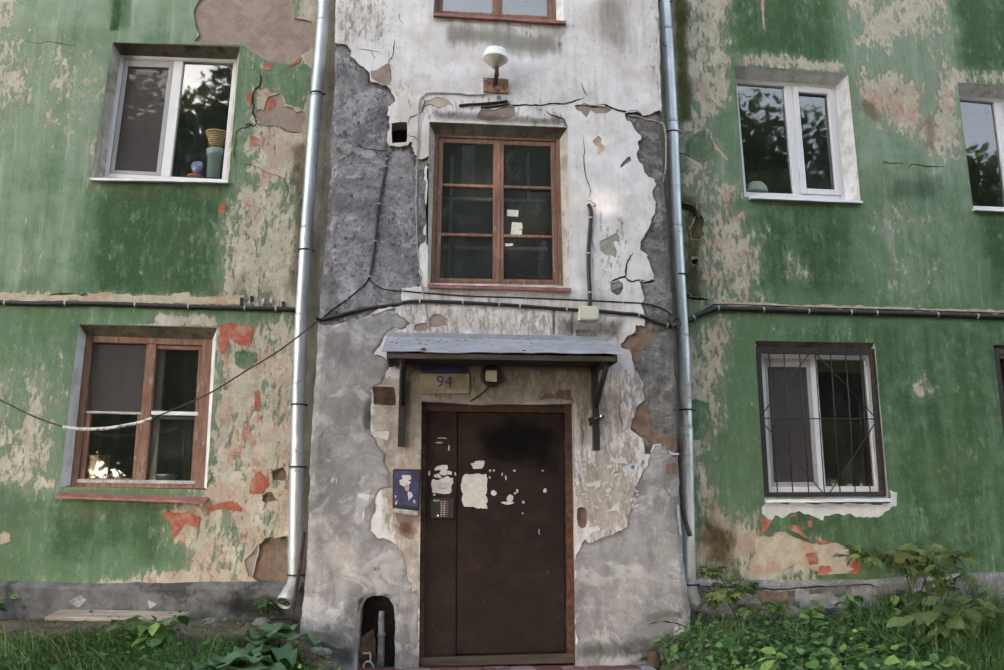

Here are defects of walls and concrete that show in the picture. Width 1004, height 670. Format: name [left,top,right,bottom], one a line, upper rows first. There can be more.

water stain [110,0,120,30]
peeling [194,0,314,132]
spalling [371,64,391,85]
crack [509,83,641,254]
crack [883,161,944,169]
peeling [235,349,258,370]
flaking render [623,326,658,373]
flaking render [631,405,678,475]
peeling [249,468,287,503]
hole [577,507,587,528]
spalling [245,536,288,581]
peeling [751,513,867,621]